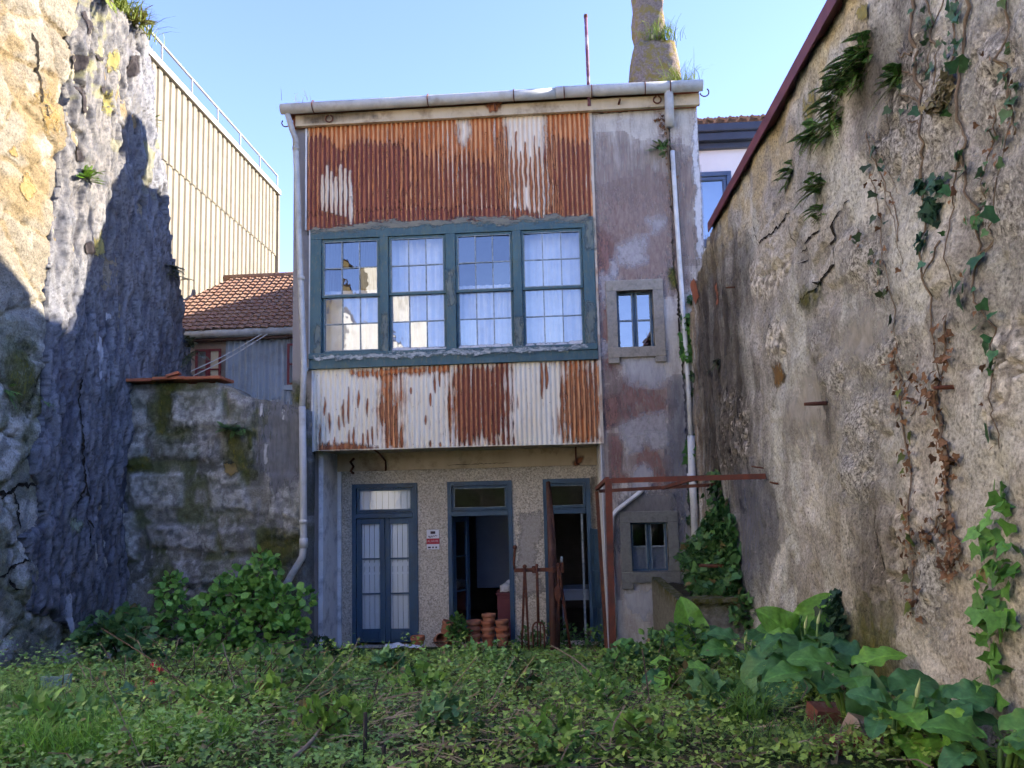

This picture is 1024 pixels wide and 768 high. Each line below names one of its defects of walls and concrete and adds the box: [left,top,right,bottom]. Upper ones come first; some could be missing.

corrosion [307,102,593,231]
leakage [599,220,663,302]
crack [750,200,848,304]
crack [77,380,94,537]
leakage [241,398,319,497]
corrosion [317,363,519,450]
corrosion [540,360,602,443]
crack [0,482,37,528]
crack [0,558,31,591]